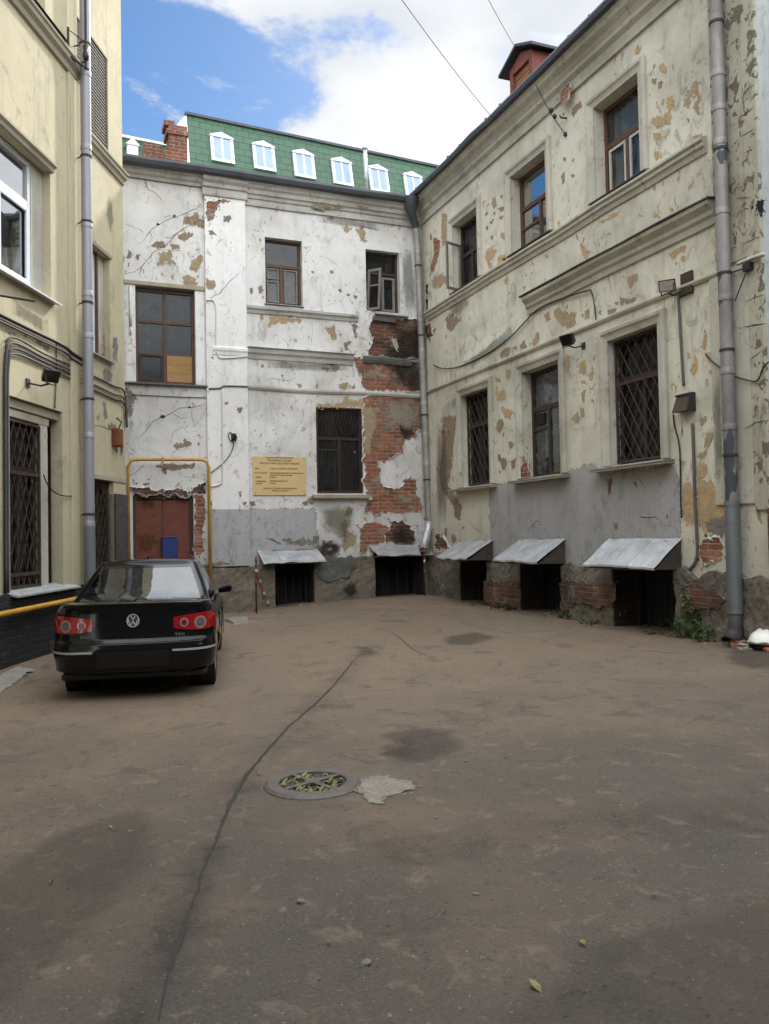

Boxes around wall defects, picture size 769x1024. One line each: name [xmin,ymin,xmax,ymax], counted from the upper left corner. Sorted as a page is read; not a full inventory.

crack [126,179,203,274]
spalling [151,198,231,290]
spalling [751,196,766,217]
spalling [544,273,638,329]
flaking render [267,213,464,587]
spalling [130,462,233,568]
spalling [672,416,726,621]